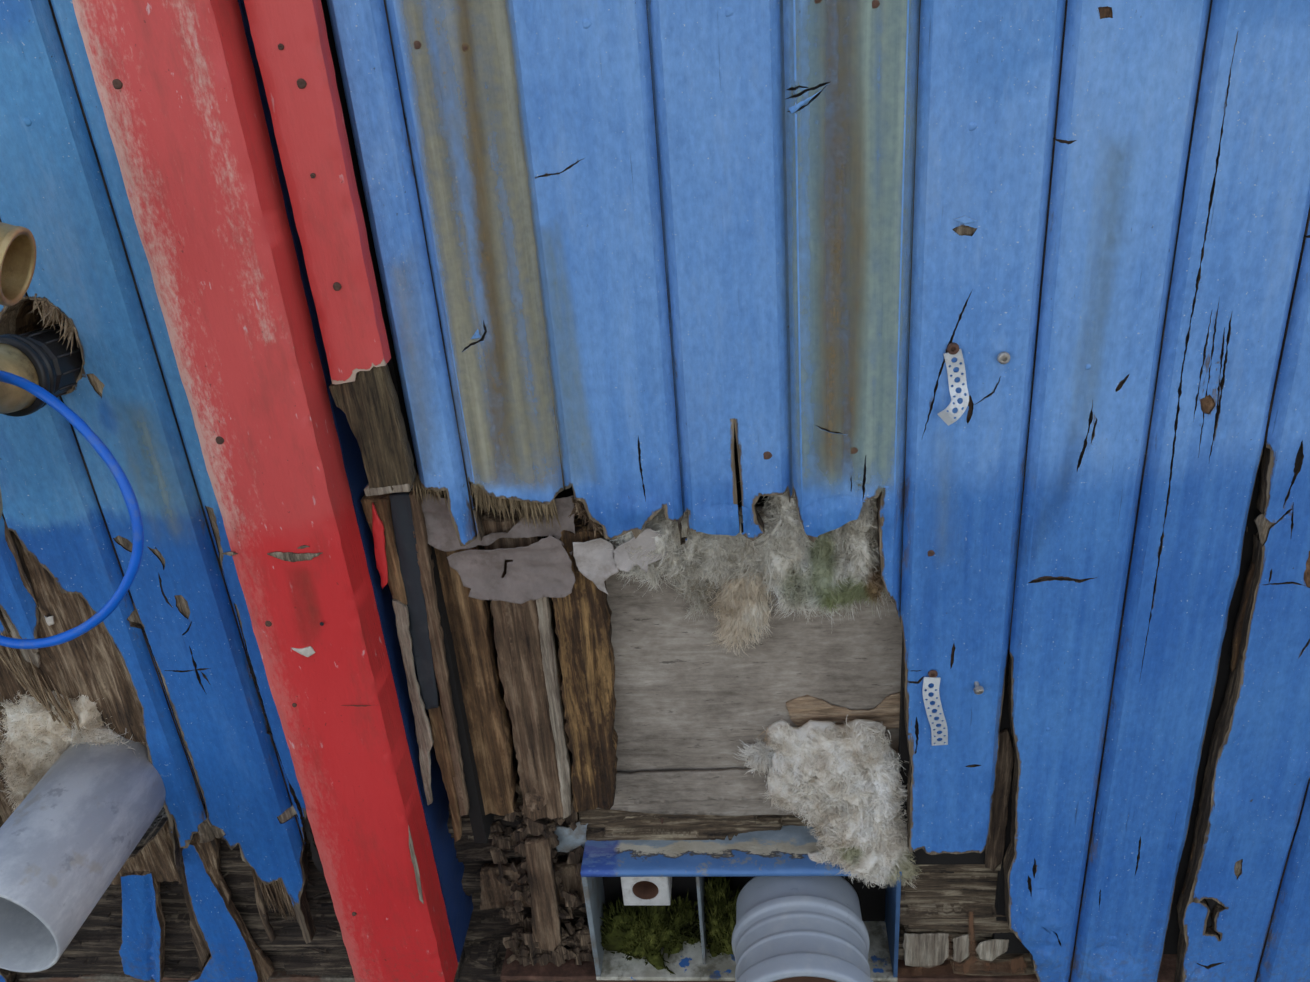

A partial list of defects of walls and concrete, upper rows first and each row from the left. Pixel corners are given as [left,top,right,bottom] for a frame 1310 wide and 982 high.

crack [927,300,967,419]
crack [1158,153,1229,555]
crack [966,390,994,421]
spalling [114,535,133,551]
peeling [206,506,238,569]
spalling [267,545,322,562]
peeling [128,603,225,843]
peeling [278,805,297,823]
spalling [408,825,424,904]